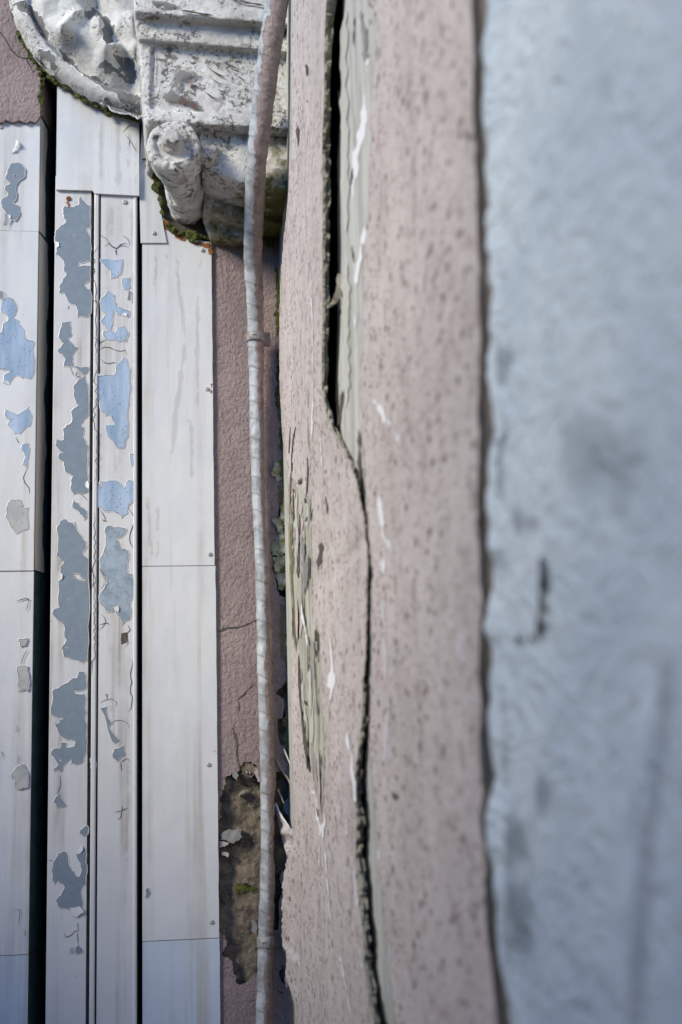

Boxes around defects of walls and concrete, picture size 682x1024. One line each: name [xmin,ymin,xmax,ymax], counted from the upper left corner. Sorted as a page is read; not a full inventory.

peeling [12,0,142,119]
peeling [1,140,26,225]
peeling [0,291,36,385]
peeling [4,406,33,468]
peeling [5,498,29,534]
peeling [50,196,134,772]
crack [288,0,387,1024]
peeling [16,665,30,691]
spalling [218,459,325,984]
peeling [10,763,29,790]
peeling [53,793,67,808]
peeling [51,825,89,917]